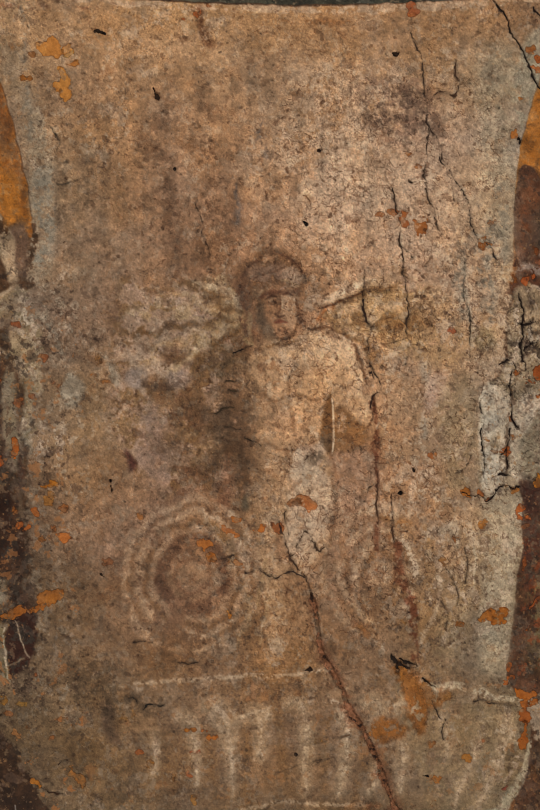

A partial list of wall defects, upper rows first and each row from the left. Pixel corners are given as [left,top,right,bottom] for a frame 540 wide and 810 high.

peeling [11,35,79,102]
crack [493,1,540,89]
crack [392,34,497,260]
peeling [375,208,428,236]
crack [362,276,381,408]
crack [457,293,537,502]
peeling [287,494,318,513]
peeling [0,588,64,620]
peeling [478,607,509,625]
crack [245,511,399,810]
crack [391,655,446,740]
peeling [503,662,538,750]